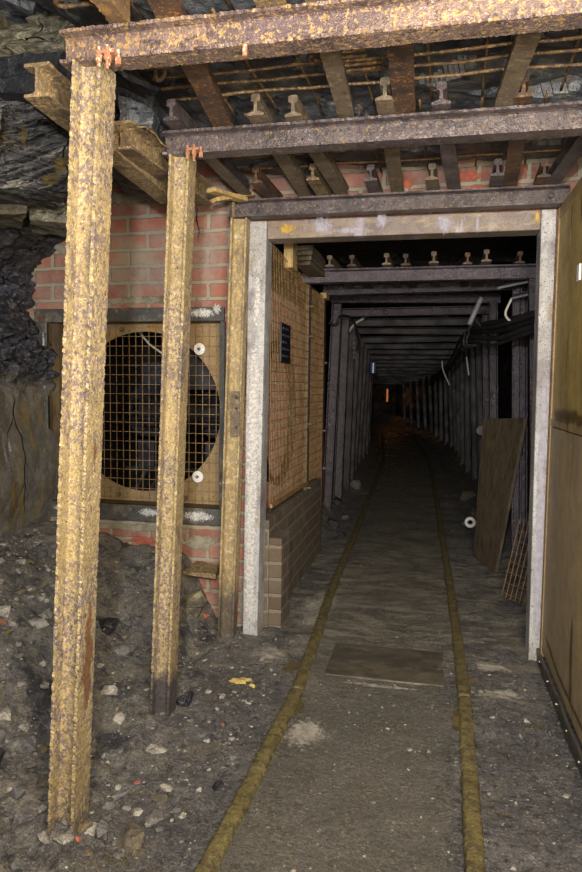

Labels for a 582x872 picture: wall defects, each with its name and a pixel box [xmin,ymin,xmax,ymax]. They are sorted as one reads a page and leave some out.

rust [82,604,92,708]